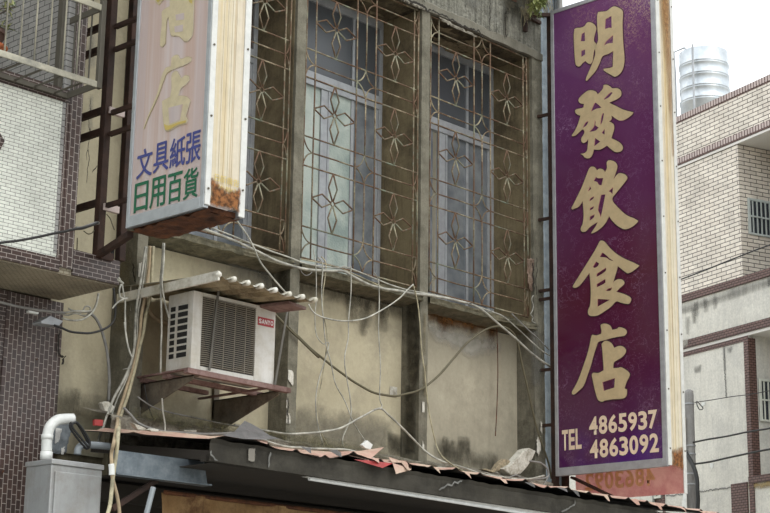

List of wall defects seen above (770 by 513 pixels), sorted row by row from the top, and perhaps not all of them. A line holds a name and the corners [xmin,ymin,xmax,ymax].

damp [440,441,495,470]